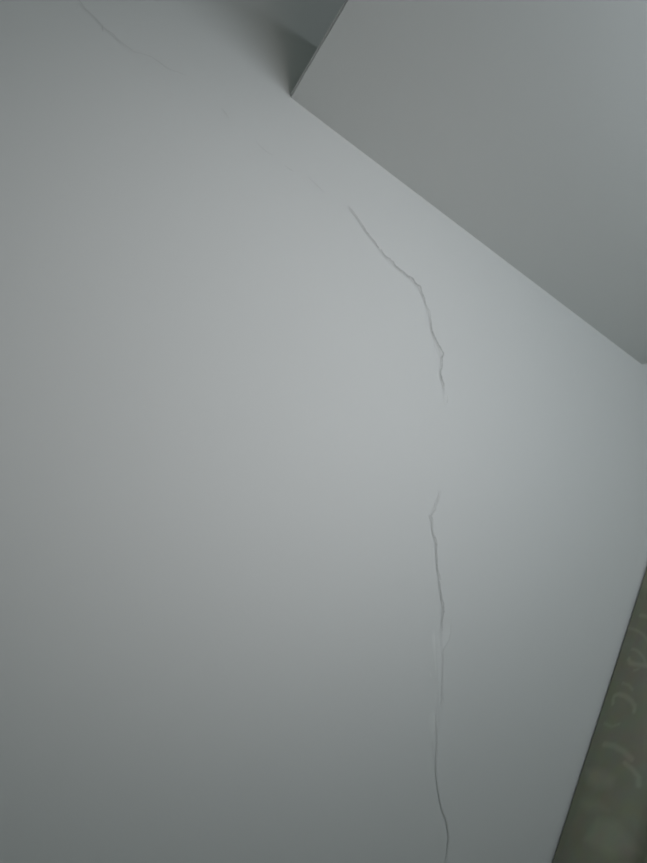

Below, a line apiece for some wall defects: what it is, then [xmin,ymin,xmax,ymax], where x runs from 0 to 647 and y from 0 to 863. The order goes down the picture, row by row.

crack [348,207,446,392]
crack [429,490,445,631]